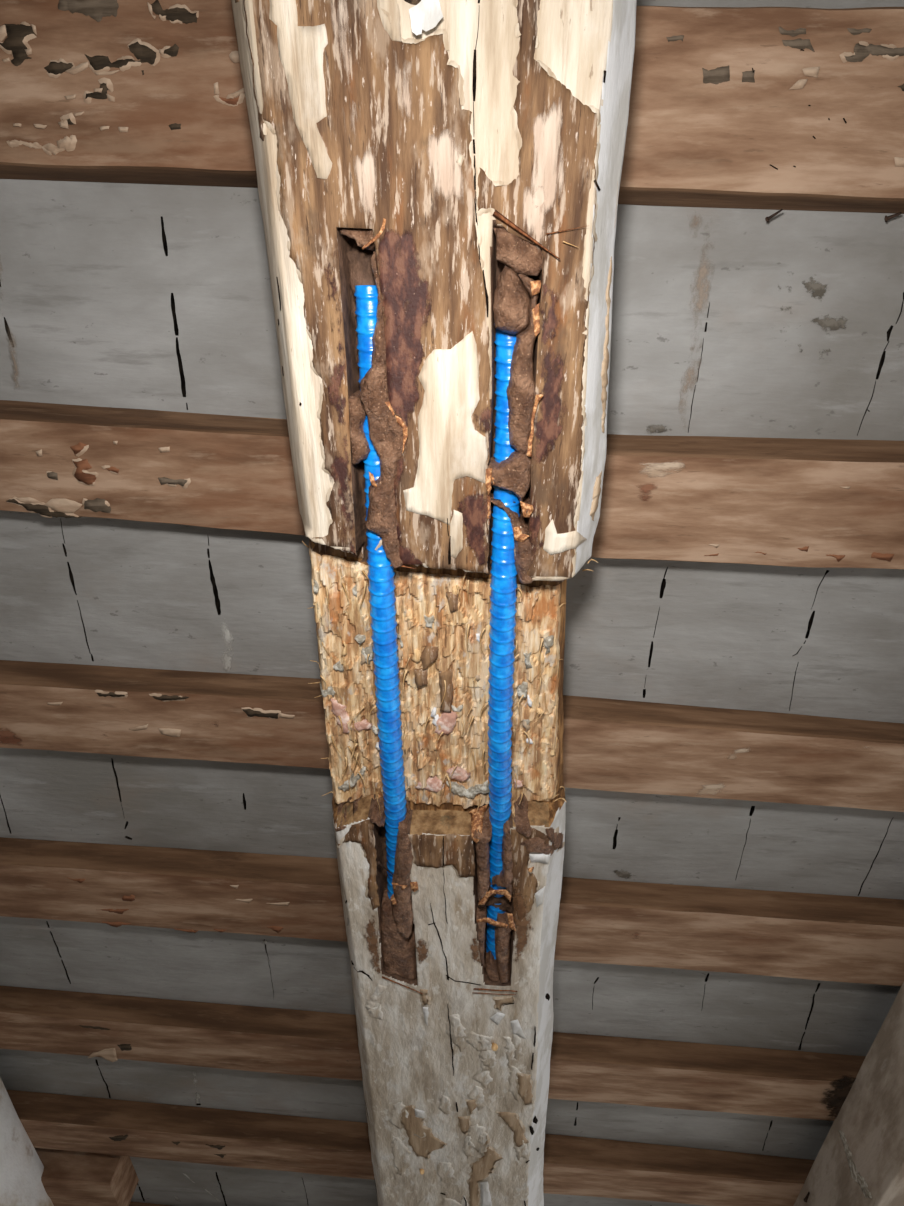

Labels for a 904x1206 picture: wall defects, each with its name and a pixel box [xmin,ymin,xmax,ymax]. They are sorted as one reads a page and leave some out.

peeling [0,22,37,66]
peeling [6,38,179,155]
peeling [702,66,755,84]
crack [160,216,168,256]
crack [171,293,188,410]
crack [857,292,904,435]
peeling [6,442,119,518]
peeling [213,0,612,931]
crack [60,518,94,661]
crack [643,567,668,698]
crack [789,570,829,711]
peeling [389,995,534,1206]